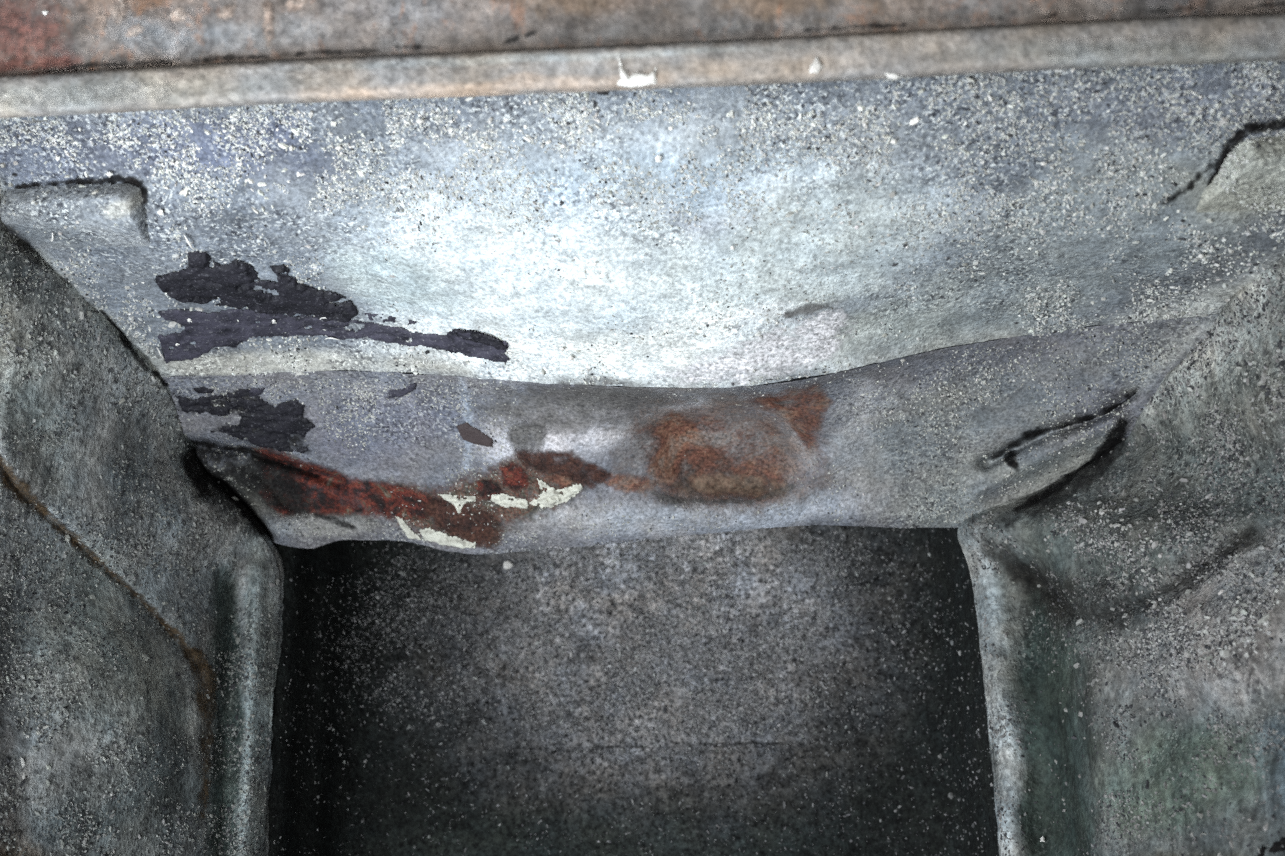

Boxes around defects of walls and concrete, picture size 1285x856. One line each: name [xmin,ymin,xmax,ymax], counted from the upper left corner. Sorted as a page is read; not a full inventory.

crack [4,175,147,205]
crack [1161,119,1285,205]
peeling [154,251,510,363]
peeling [173,387,315,453]
peeling [389,382,417,398]
peeling [457,423,493,448]
peeling [438,478,583,514]
corrosion [253,387,830,547]
crack [992,388,1137,511]
peeling [395,516,476,549]
corrosion [0,457,216,819]
spalling [1258,837,1285,856]